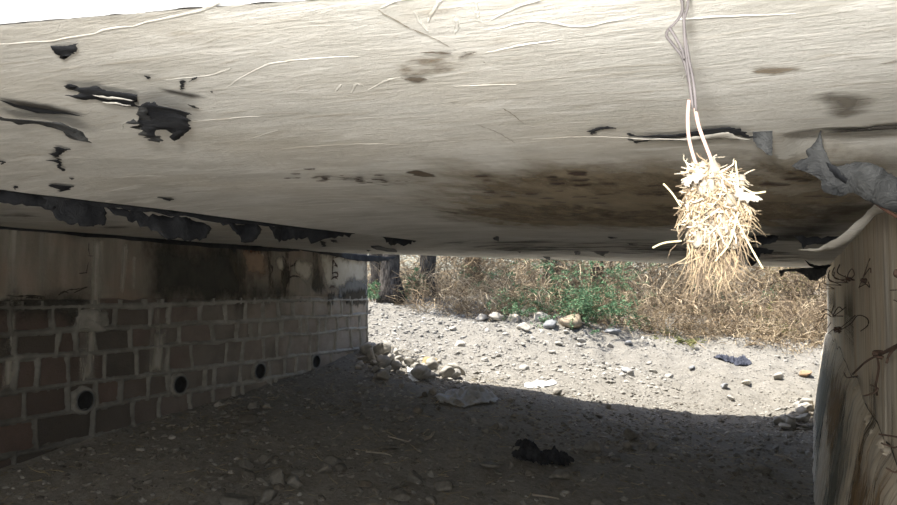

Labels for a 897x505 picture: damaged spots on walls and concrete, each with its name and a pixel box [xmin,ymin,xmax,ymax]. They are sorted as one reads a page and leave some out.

peeling [51,43,78,59]
peeling [0,100,91,143]
peeling [64,77,199,143]
water stain [151,243,262,303]
corrosion [847,439,891,505]